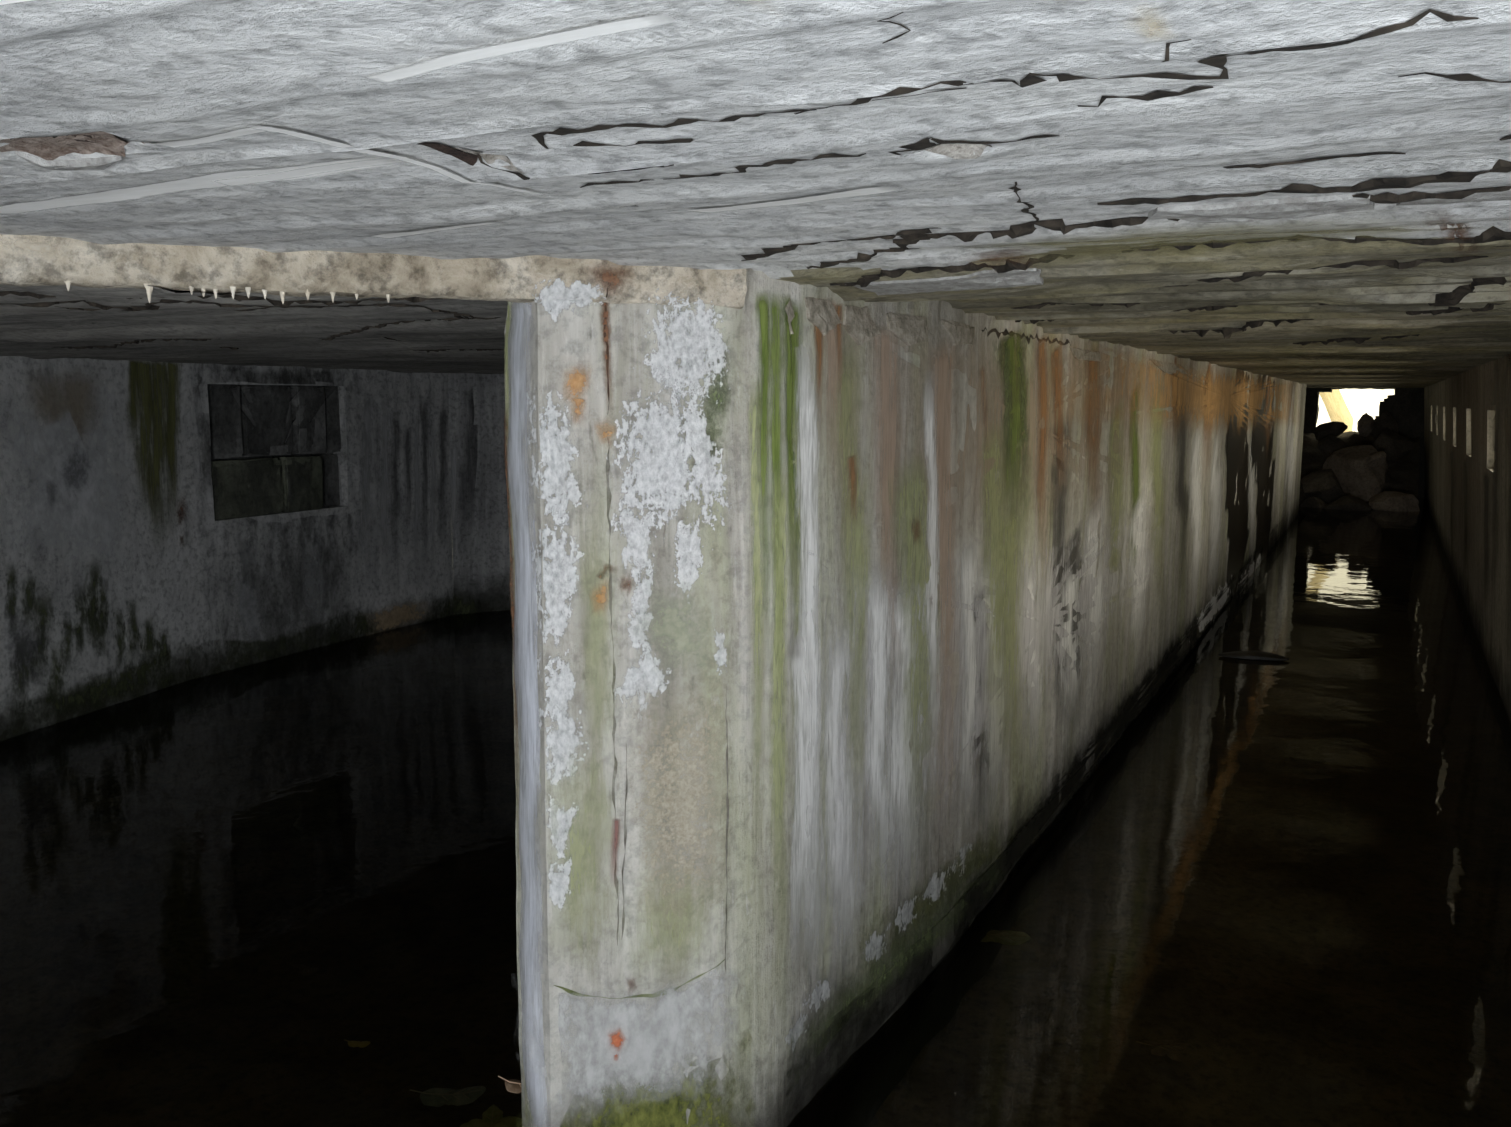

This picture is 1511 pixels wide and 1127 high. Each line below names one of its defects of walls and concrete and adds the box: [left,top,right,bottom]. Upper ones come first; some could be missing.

spalling [0,131,145,171]
spalling [418,143,540,180]
crack [531,9,1479,188]
crack [1398,72,1511,83]
crack [0,299,273,350]
crack [319,304,505,353]
rust [815,305,842,400]
damp [129,361,178,511]
damp [364,397,477,536]
rust [935,342,1293,634]
damp [6,570,169,694]
damp [750,298,1294,1084]